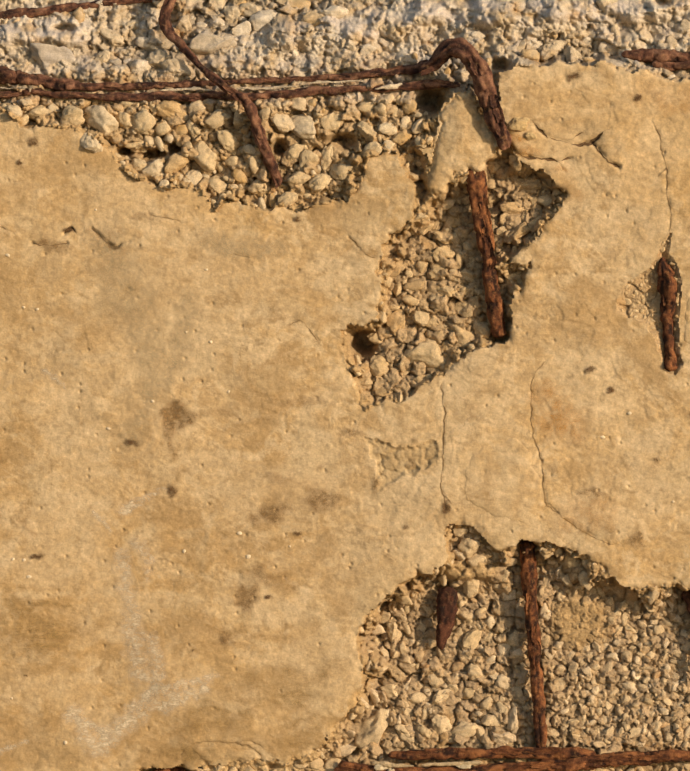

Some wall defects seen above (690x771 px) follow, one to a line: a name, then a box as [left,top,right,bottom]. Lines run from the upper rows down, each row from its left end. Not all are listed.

spalling [0,0,690,412]
crack [440,384,452,512]
crack [530,364,620,545]
spalling [139,524,690,771]